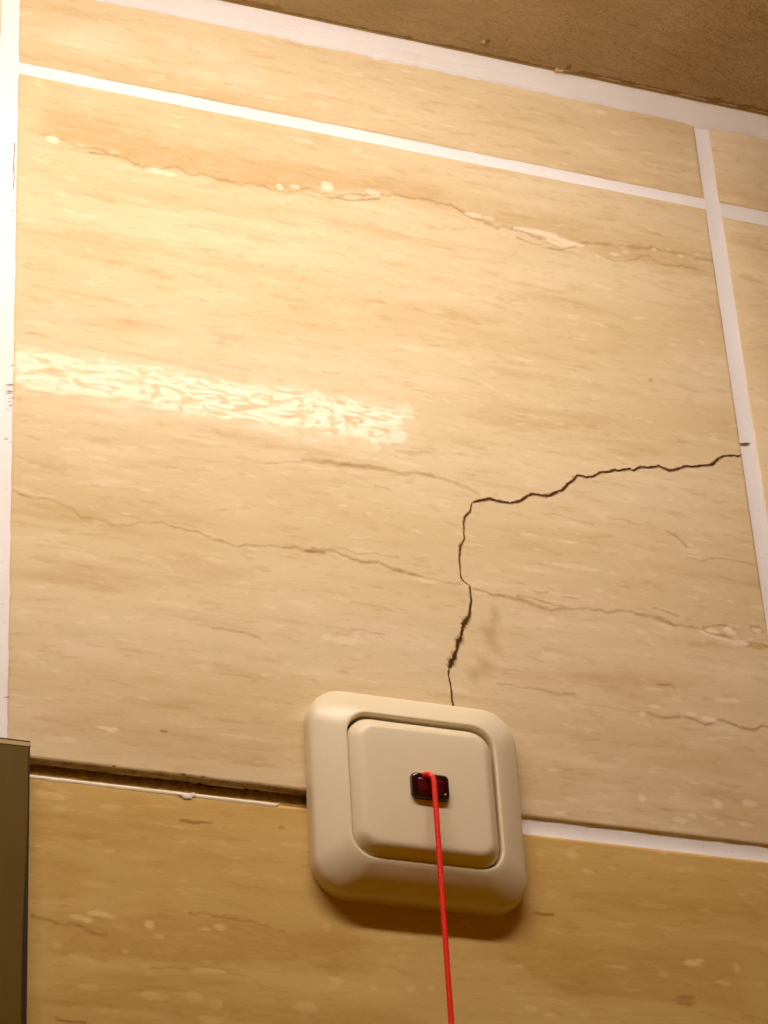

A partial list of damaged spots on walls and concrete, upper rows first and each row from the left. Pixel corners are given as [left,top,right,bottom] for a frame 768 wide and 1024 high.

crack [447,443,750,706]